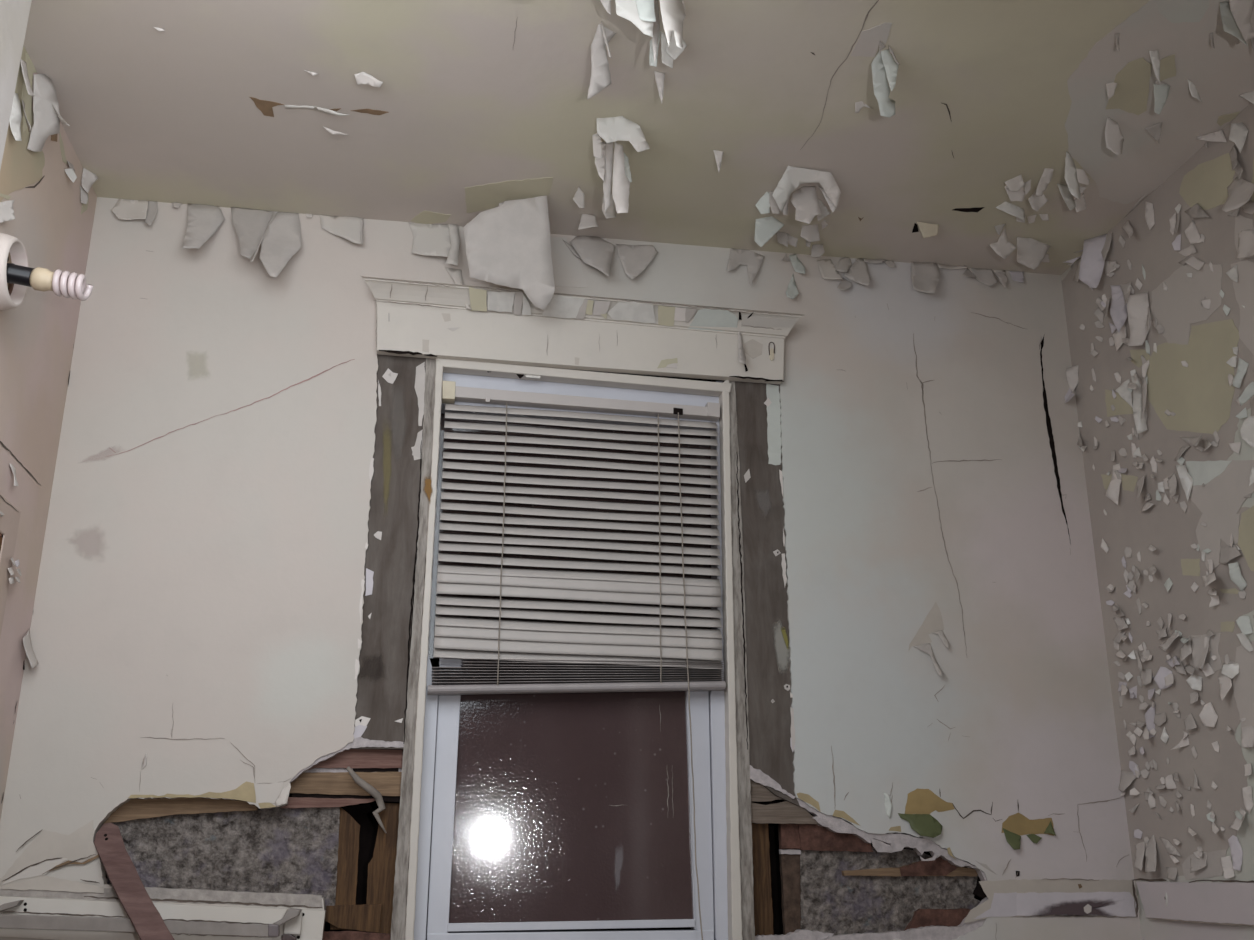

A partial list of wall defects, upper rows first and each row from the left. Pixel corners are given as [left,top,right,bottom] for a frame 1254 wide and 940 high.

peeling [0,45,98,223]
crack [107,276,510,457]
peeling [408,116,796,372]
peeling [587,0,687,103]
crack [554,294,805,343]
spalling [764,384,783,495]
peeling [755,166,841,257]
crack [800,0,879,150]
crack [971,312,1071,555]
peeling [953,0,1254,905]
spalling [102,716,409,940]
spalling [750,765,997,940]